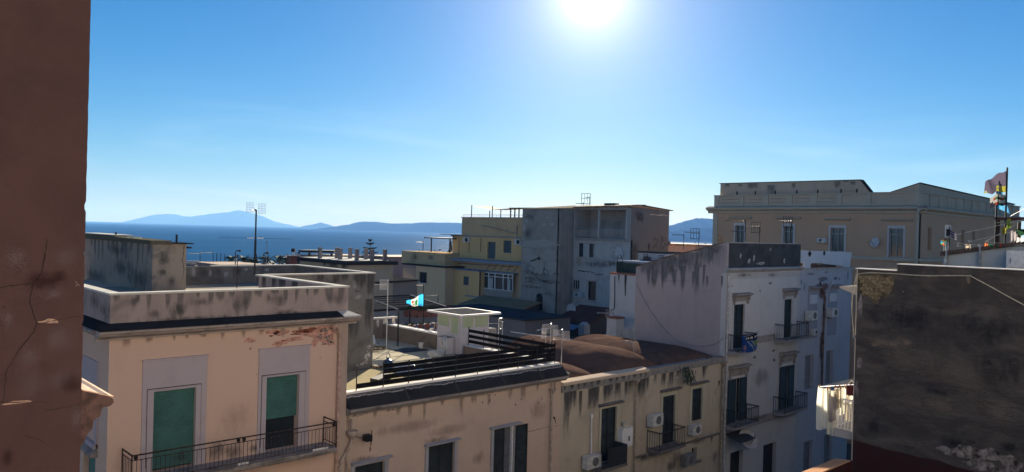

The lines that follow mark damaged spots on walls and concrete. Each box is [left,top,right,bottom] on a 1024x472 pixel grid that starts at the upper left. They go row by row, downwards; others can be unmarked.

damp [591,244,720,290]
damp [197,263,375,333]
crack [0,239,82,410]
peeling [243,325,335,359]
damp [554,371,678,415]
flaking render [935,445,1023,472]